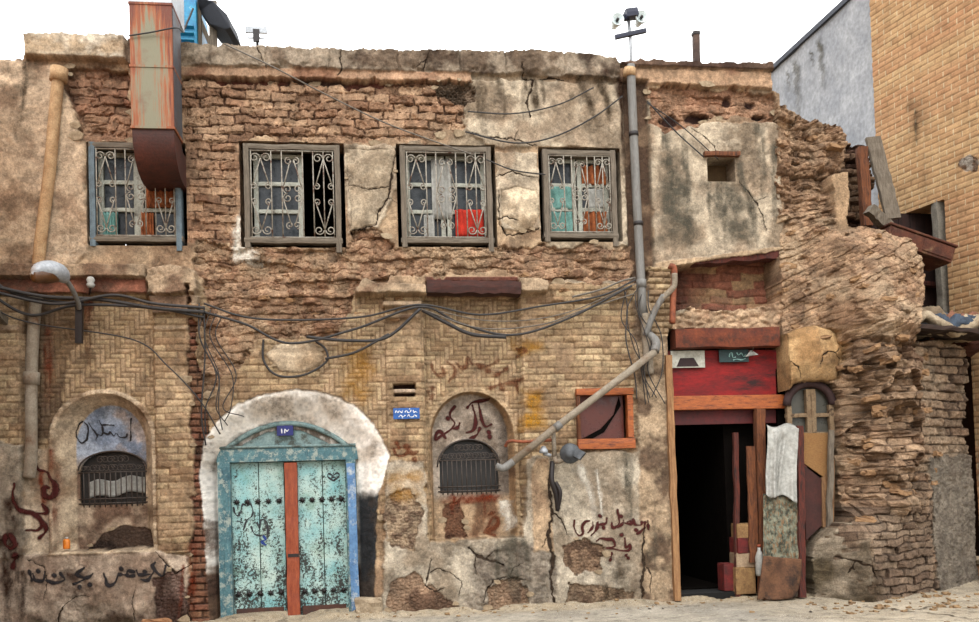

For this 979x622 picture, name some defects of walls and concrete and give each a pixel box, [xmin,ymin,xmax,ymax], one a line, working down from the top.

crack [349,148,397,235]
crack [496,170,539,236]
leakage [662,134,693,240]
leakage [708,163,753,239]
spalling [152,77,634,622]
crack [425,547,524,602]
crack [542,478,567,603]